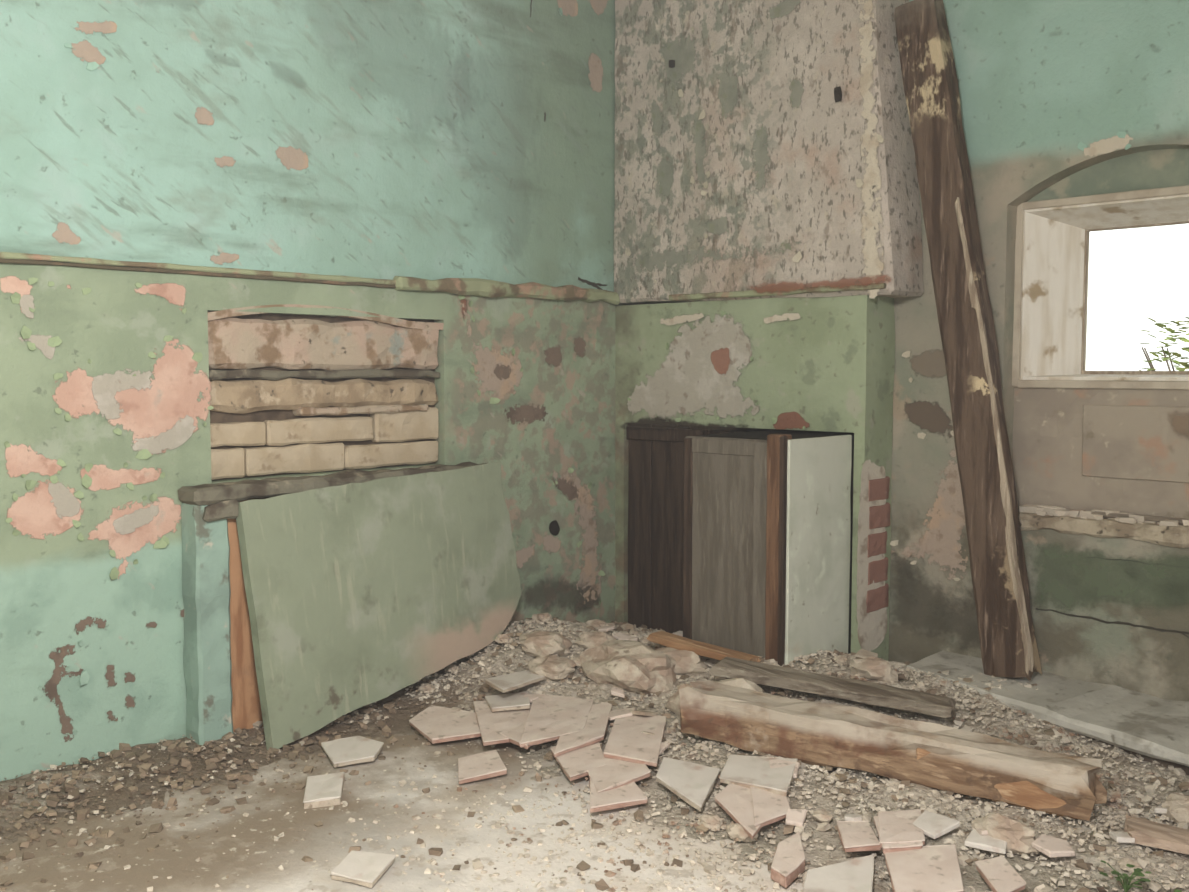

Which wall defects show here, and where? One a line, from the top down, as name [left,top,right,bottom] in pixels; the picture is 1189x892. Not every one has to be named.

peeling [64,20,117,71]
peeling [659,27,696,97]
peeling [275,146,309,171]
peeling [625,217,802,283]
peeling [0,276,92,360]
peeling [134,282,187,314]
peeling [627,311,810,430]
peeling [4,335,214,580]
flaking render [856,401,969,652]
crack [1036,608,1189,638]
flaking render [38,616,107,742]
flaking render [104,665,136,722]